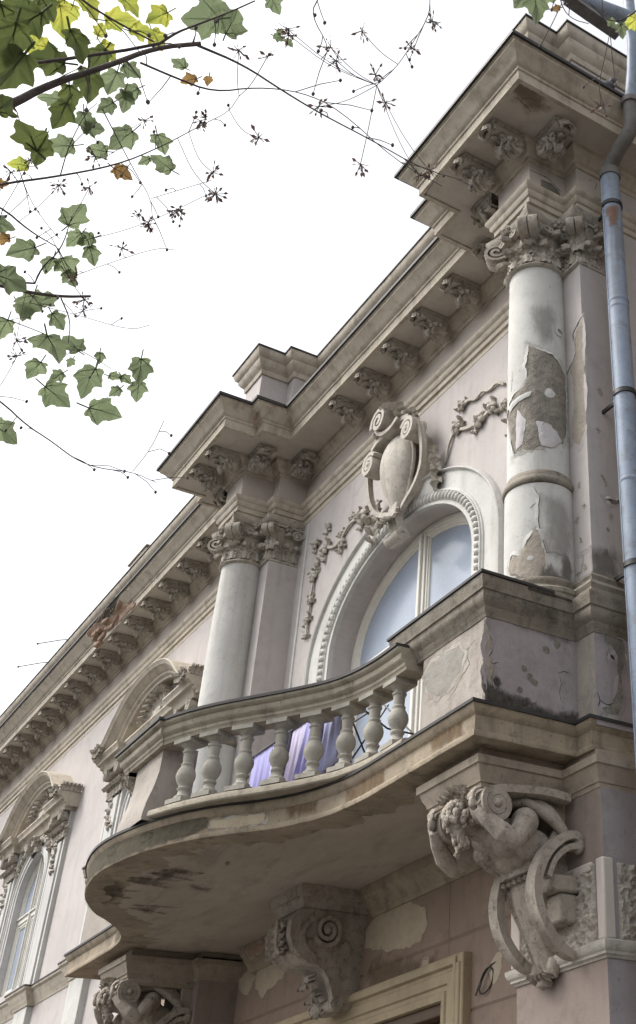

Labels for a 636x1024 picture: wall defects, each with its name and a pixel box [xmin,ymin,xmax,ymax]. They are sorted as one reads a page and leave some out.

peeling [507,314,603,459]
peeling [507,526,551,579]
damp [484,677,578,721]